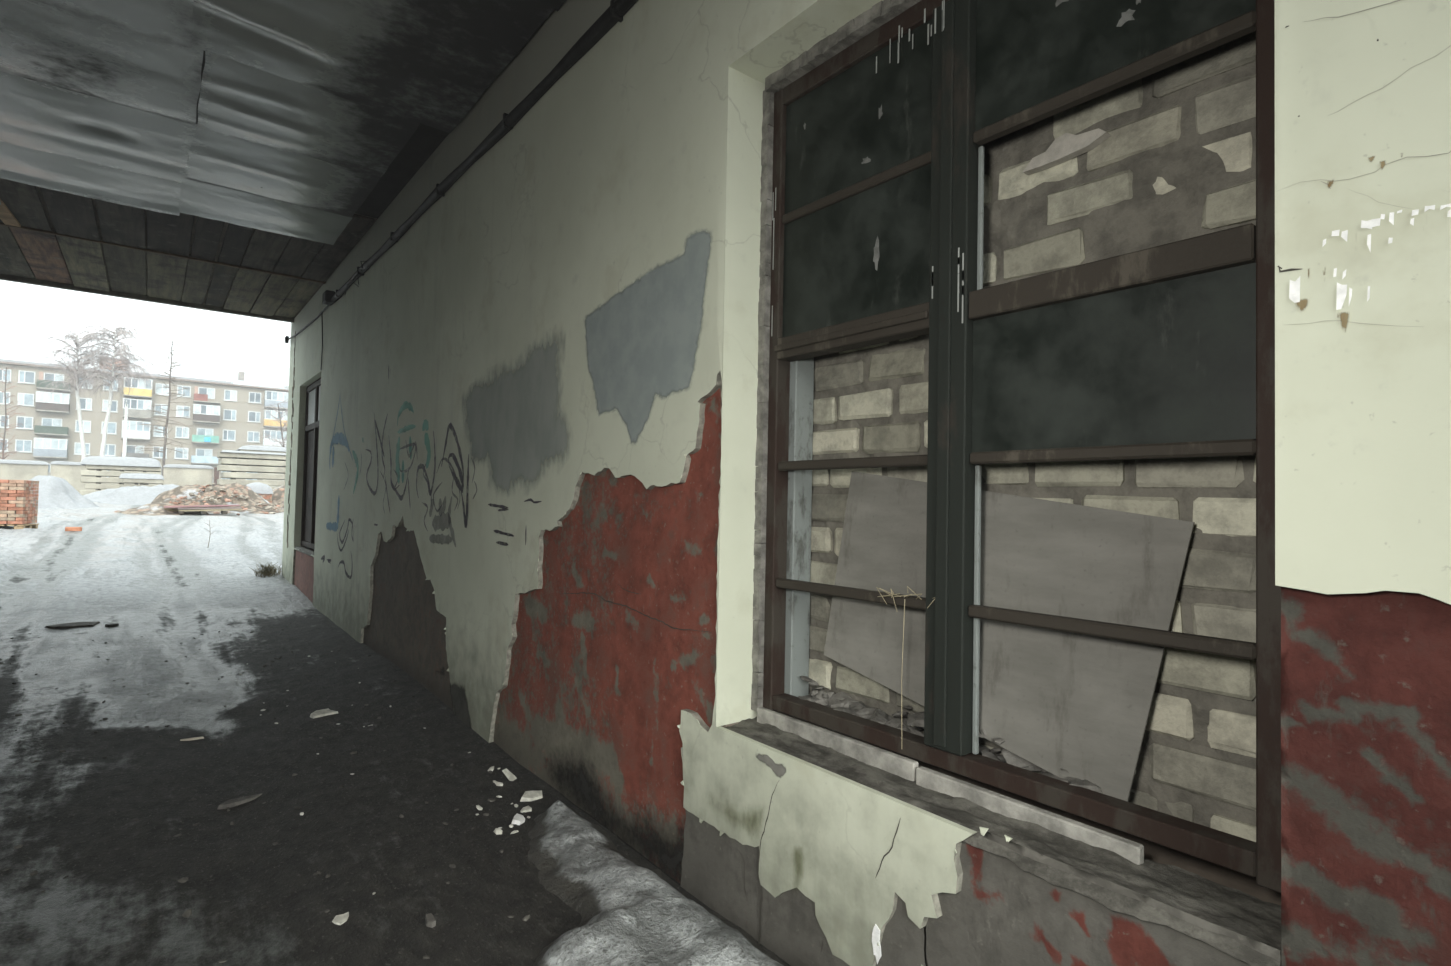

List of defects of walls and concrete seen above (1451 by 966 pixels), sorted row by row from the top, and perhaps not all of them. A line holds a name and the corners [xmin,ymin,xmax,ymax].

crack [1304,0,1401,22]
crack [1328,45,1451,116]
crack [1281,151,1451,209]
spalling [1322,203,1451,253]
spalling [1289,277,1300,303]
spalling [1333,268,1370,310]
flaking render [363,521,454,710]
flaking render [493,385,850,966]
flaking render [872,586,1451,966]